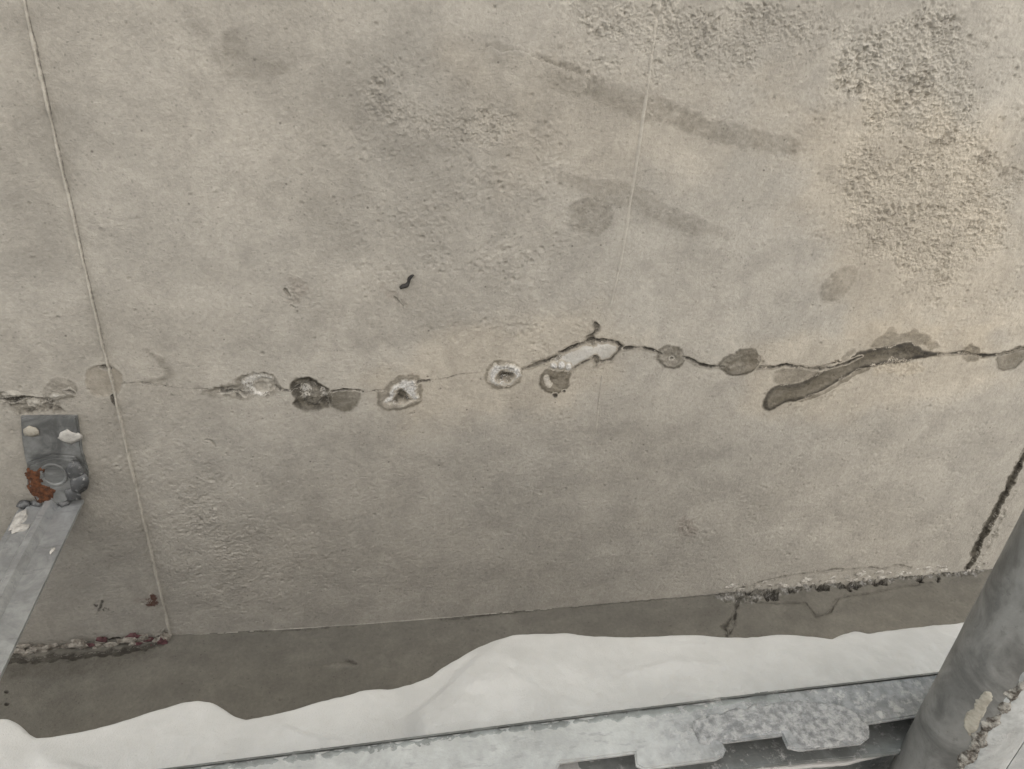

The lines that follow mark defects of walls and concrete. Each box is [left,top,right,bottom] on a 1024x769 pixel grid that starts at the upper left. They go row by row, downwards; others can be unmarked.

spalling [0,390,70,417]
spalling [199,370,333,413]
crack [414,371,489,386]
crack [521,319,728,371]
leakage [653,343,685,370]
crack [756,354,864,372]
leakage [715,325,942,406]
crack [937,346,1024,359]
leakage [995,344,1024,372]
corrosion [24,468,56,504]
crack [964,448,1024,570]
spalling [712,562,988,607]